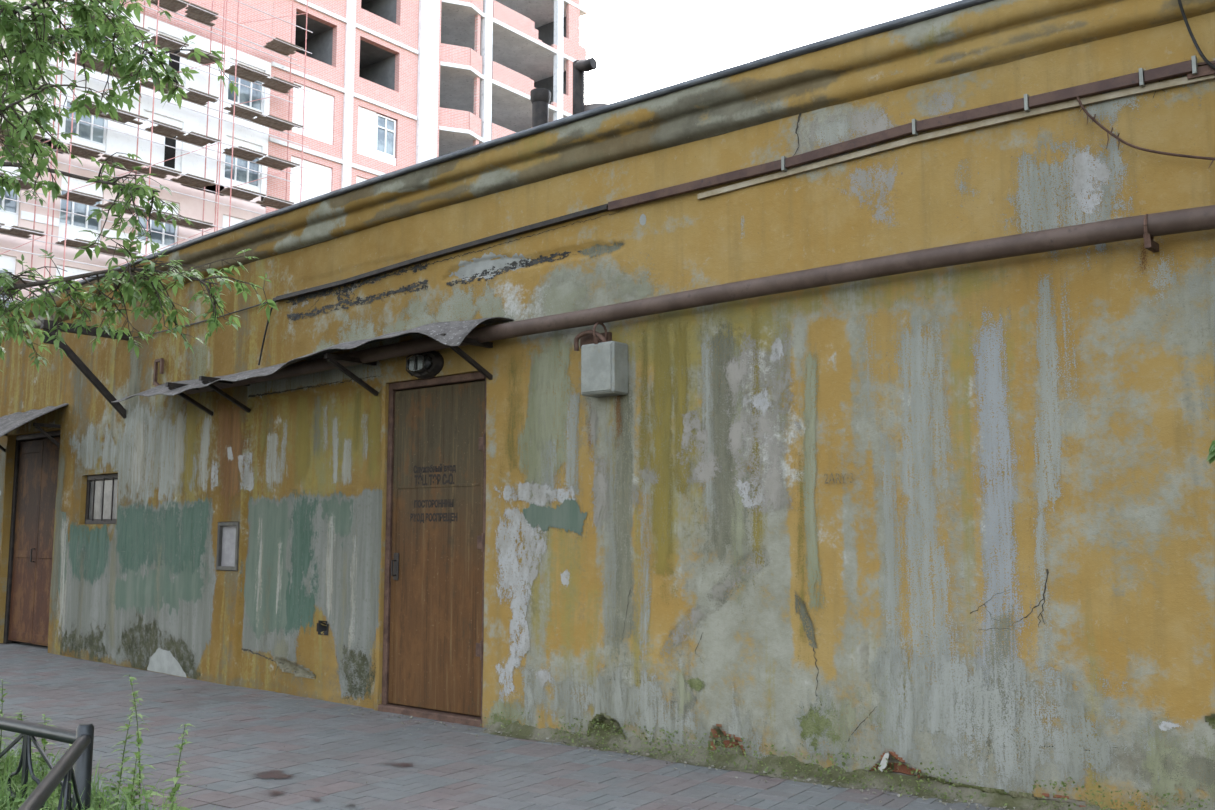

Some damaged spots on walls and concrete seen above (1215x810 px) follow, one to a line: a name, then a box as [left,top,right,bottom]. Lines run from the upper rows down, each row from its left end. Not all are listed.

water stain [48,339,215,656]
water stain [252,513,284,644]
water stain [322,511,375,686]
flaking render [287,261,428,322]
water stain [247,252,668,492]
flaking render [446,240,624,288]
peeling [493,407,611,703]
peeling [625,321,801,521]
water stain [493,237,1215,810]
crack [970,569,1049,630]
water stain [996,120,1146,236]
flaking render [1205,714,1215,729]